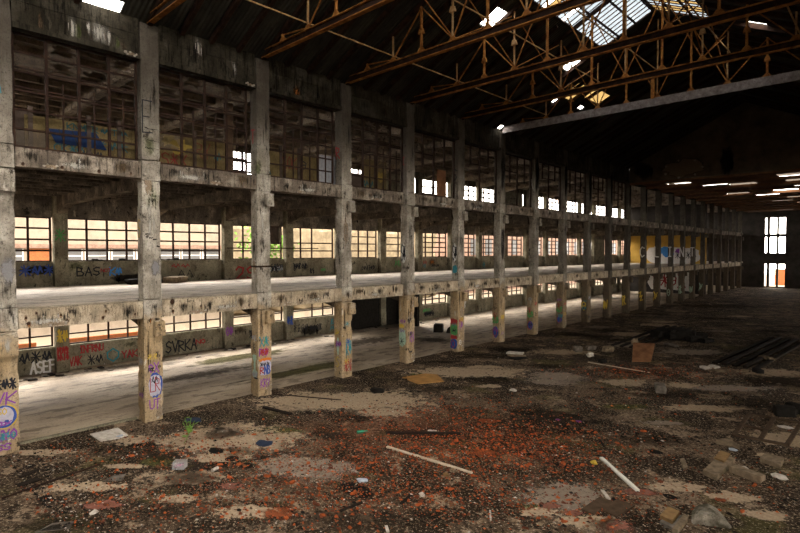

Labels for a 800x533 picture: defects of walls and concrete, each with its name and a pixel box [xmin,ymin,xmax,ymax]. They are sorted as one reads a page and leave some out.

leakage [57,4,125,50]
leakage [28,309,81,324]